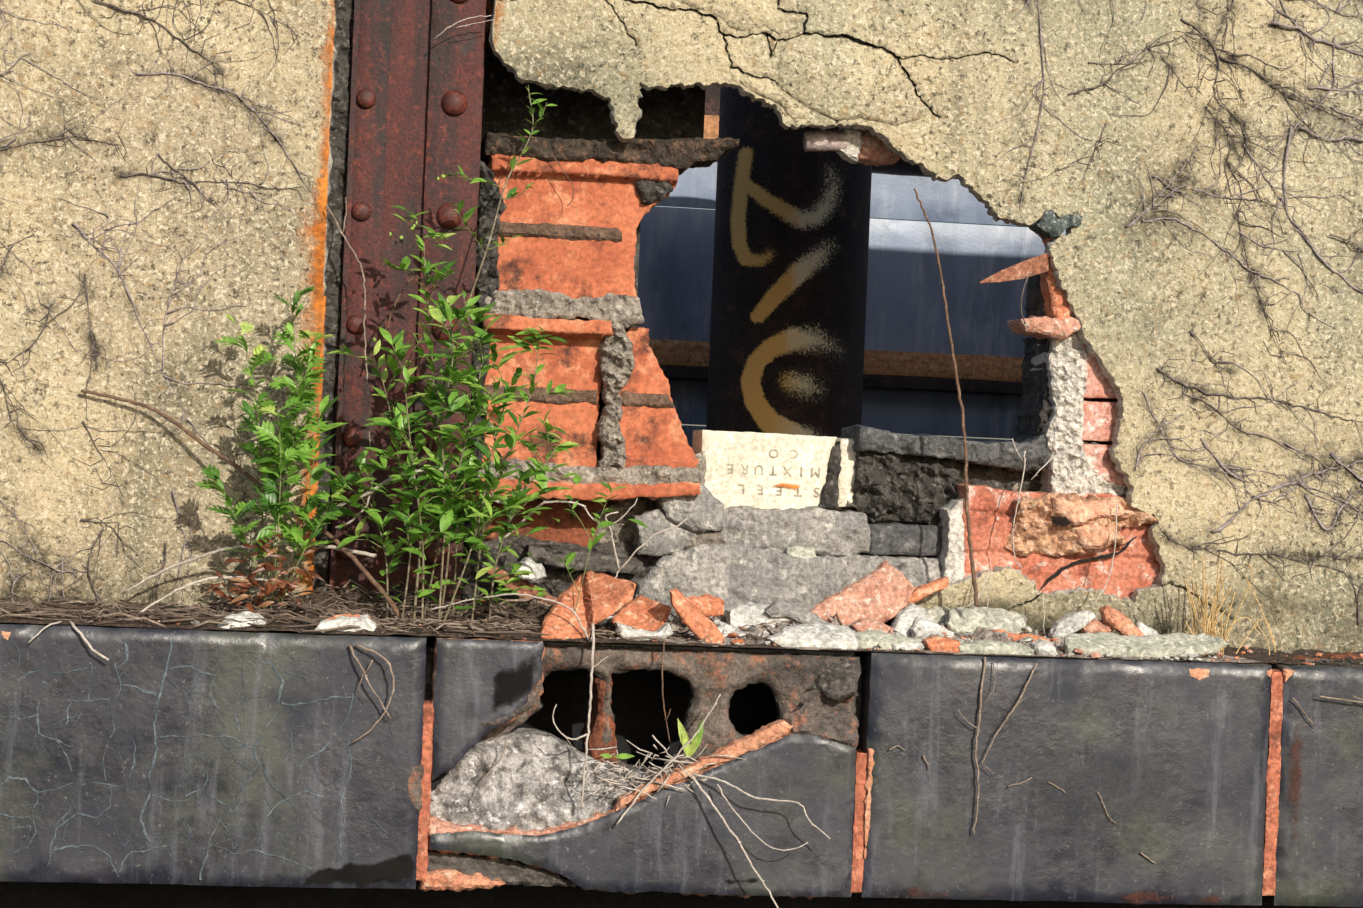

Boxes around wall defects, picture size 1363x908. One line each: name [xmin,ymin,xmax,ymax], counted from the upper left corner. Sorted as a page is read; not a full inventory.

crack [606,0,1014,117]
rust [300,19,334,596]
spalling [489,14,1166,652]
crack [0,637,393,880]
spalling [481,678,544,727]
spalling [407,719,793,892]